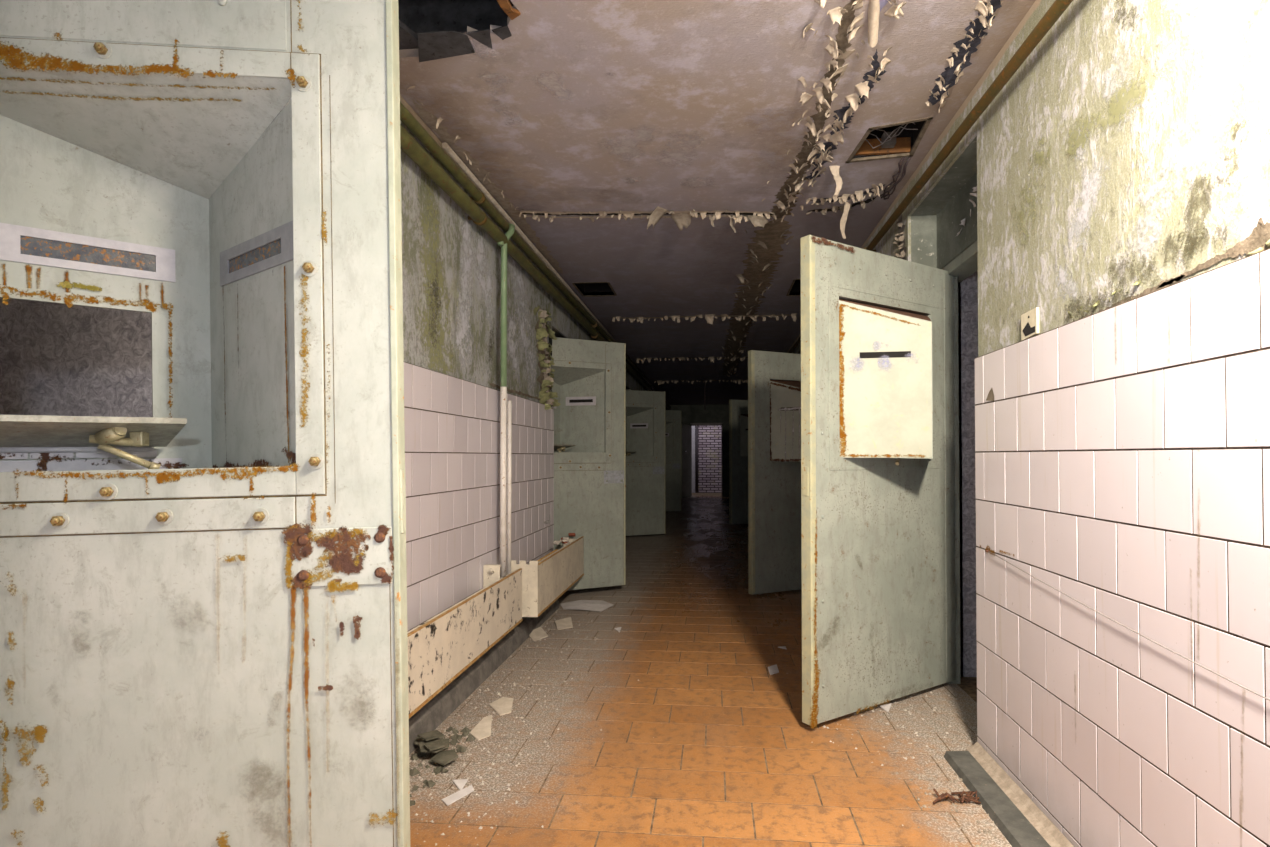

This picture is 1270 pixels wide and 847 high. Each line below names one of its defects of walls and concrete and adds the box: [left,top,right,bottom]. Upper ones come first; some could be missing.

corrosion [0,40,275,102]
peeling [925,0,1003,113]
leakage [1114,0,1143,33]
leakage [455,213,537,390]
peeling [398,0,907,385]
spalling [1023,316,1035,336]
peeling [1069,161,1107,241]
leakage [1064,121,1246,323]
spalling [1058,217,1270,321]
corrosion [0,264,311,510]
corrosion [281,493,398,847]
corrosion [0,720,48,811]